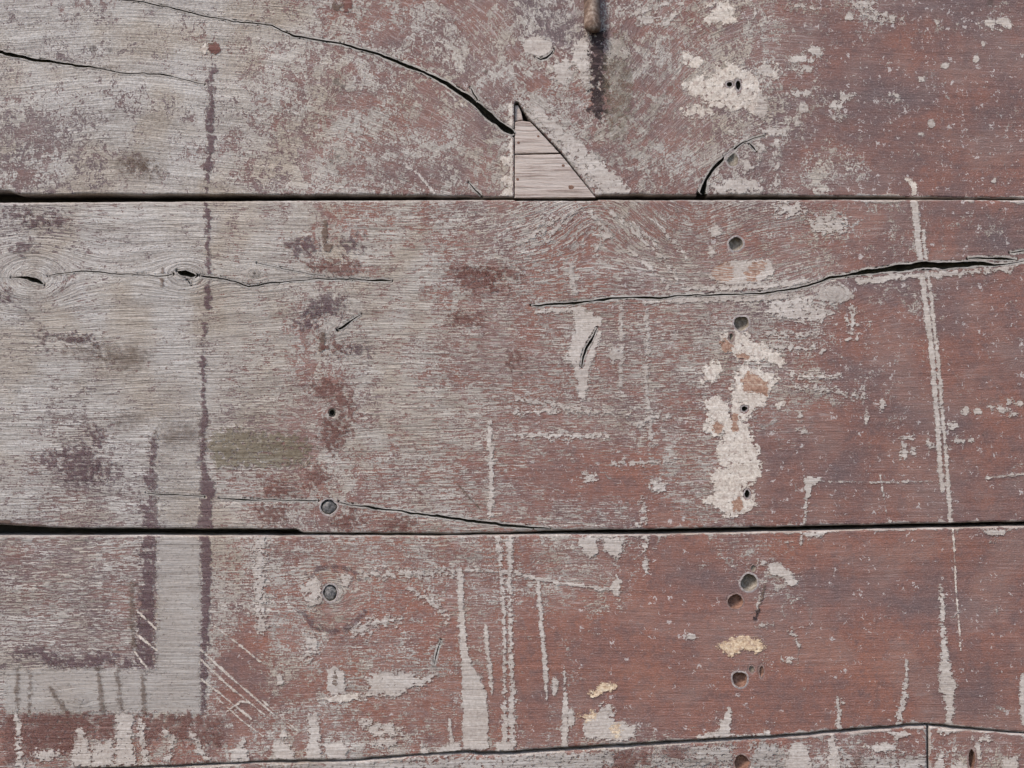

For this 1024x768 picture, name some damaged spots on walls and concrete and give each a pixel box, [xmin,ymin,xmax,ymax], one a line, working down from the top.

crack [0,48,205,86]
crack [114,0,515,136]
peeling [679,45,825,195]
peeling [829,91,857,122]
crack [698,134,766,195]
crack [47,268,173,279]
crack [200,261,392,289]
crack [531,248,1024,367]
peeling [499,98,1024,759]
crack [146,491,550,531]
peeling [998,755,1019,768]